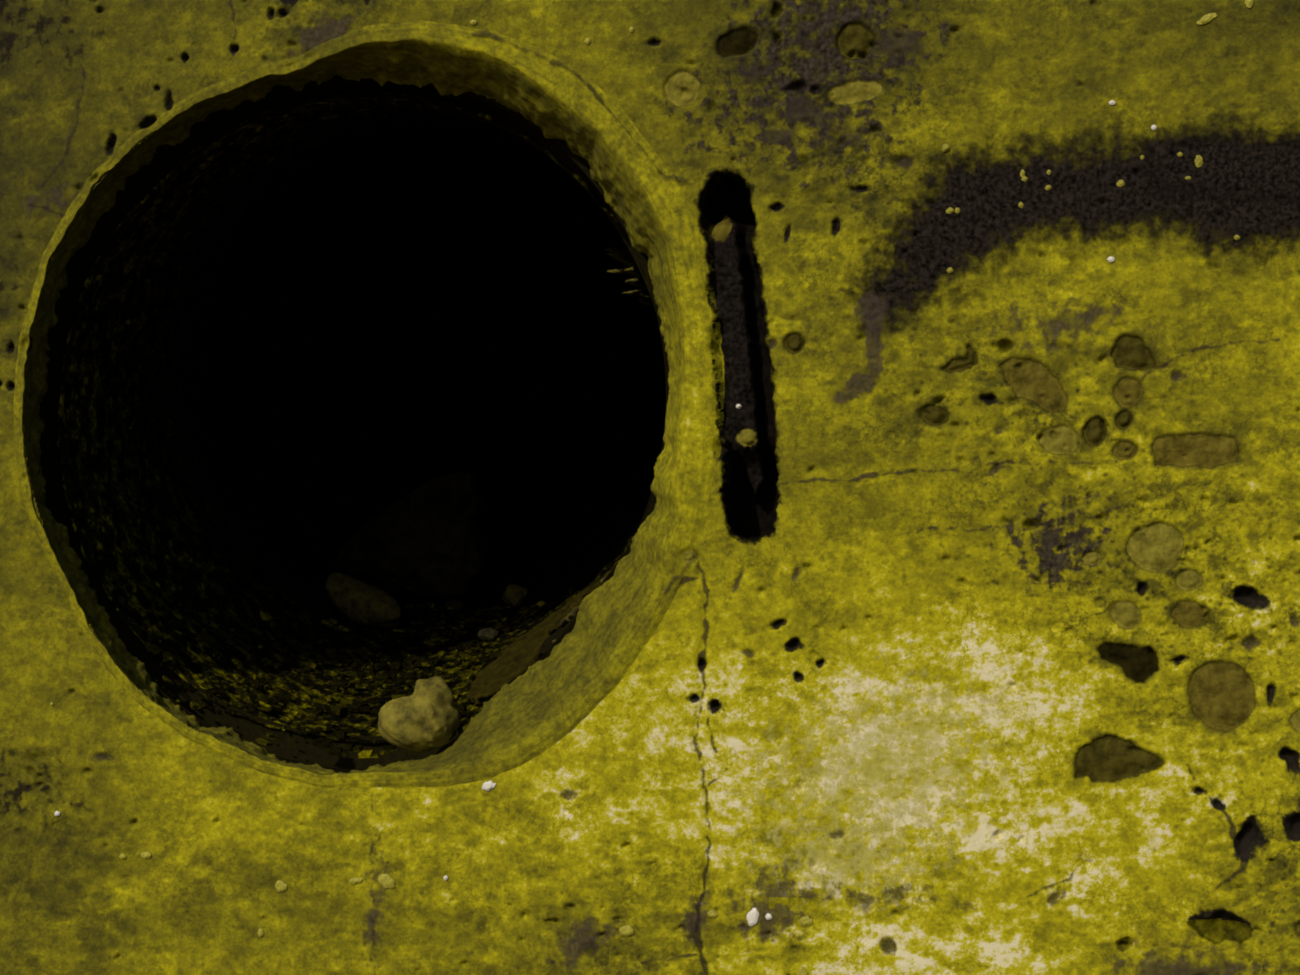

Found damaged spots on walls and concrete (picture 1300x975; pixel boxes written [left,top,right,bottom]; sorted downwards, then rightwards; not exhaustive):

water stain [834,120,1300,403]
crack [642,559,717,975]